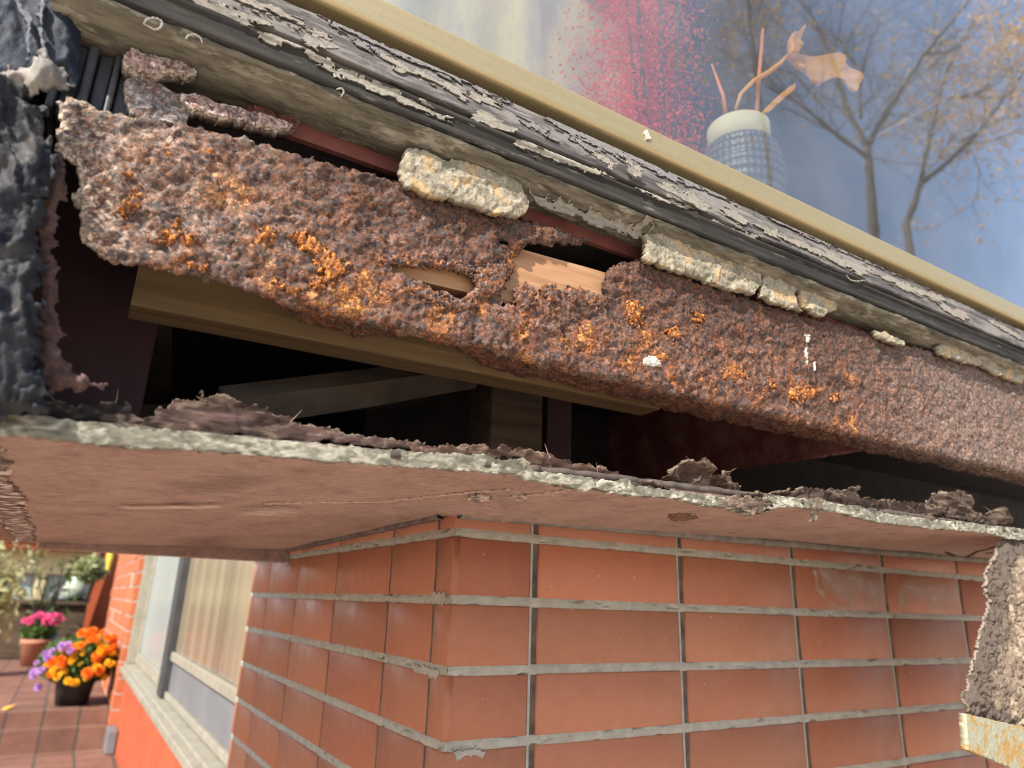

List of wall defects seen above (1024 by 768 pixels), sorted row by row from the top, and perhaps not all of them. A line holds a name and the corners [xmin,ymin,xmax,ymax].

rust [112,163,149,220]
peeling [180,0,1024,341]
rust [148,217,210,276]
rust [258,223,353,297]
rust [379,254,608,313]
rust [623,300,646,326]
rust [663,325,684,345]
rust [691,309,707,327]
spalling [869,330,905,347]
spalling [171,386,217,403]
rust [788,385,842,404]
spalling [0,389,1024,541]